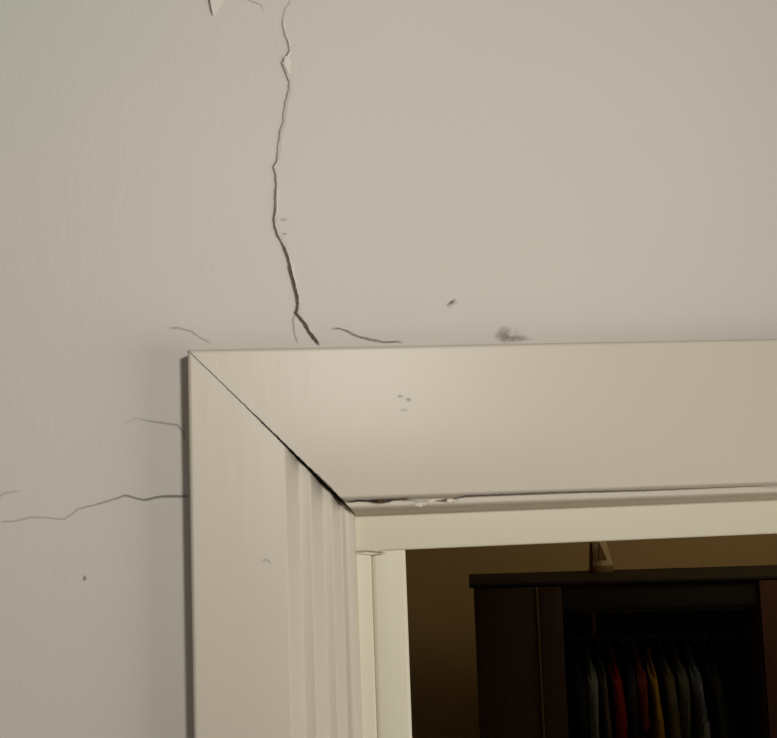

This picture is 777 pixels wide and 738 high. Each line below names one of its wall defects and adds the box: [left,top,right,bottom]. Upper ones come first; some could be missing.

crack [273,21,319,344]